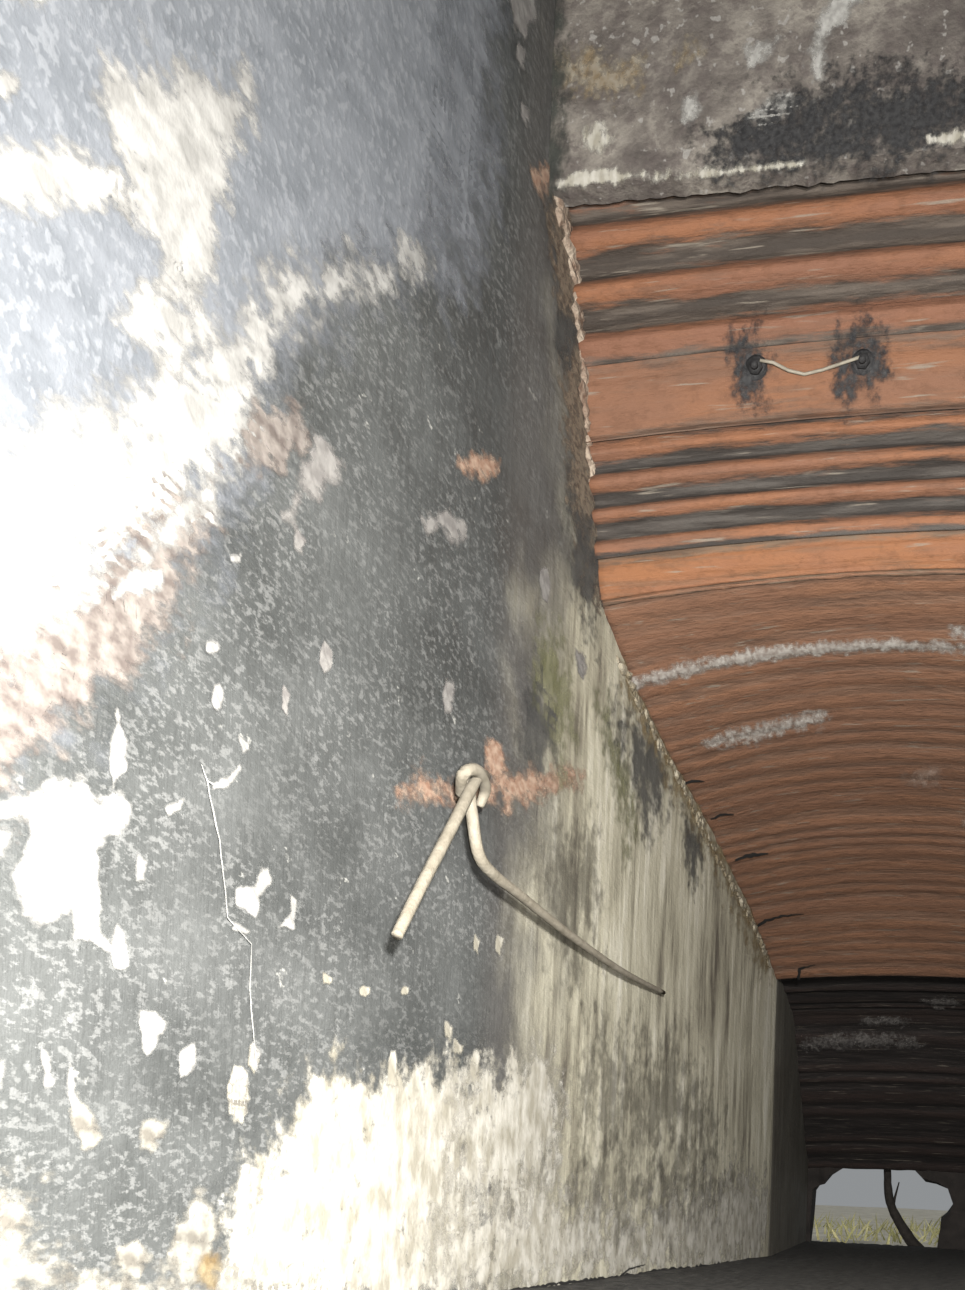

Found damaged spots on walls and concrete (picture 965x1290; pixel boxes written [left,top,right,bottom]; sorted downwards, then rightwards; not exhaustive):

leakage [812,0,857,79]
leakage [830,314,890,405]
peeling [0,0,537,969]
corrosion [457,452,500,483]
leakage [632,626,965,689]
leakage [705,710,826,747]
corrosion [396,775,459,805]
corrosion [476,739,584,814]
peeling [41,1050,78,1110]
peeling [139,1011,166,1055]
peeling [179,1043,196,1077]
peeling [220,1021,769,1290]